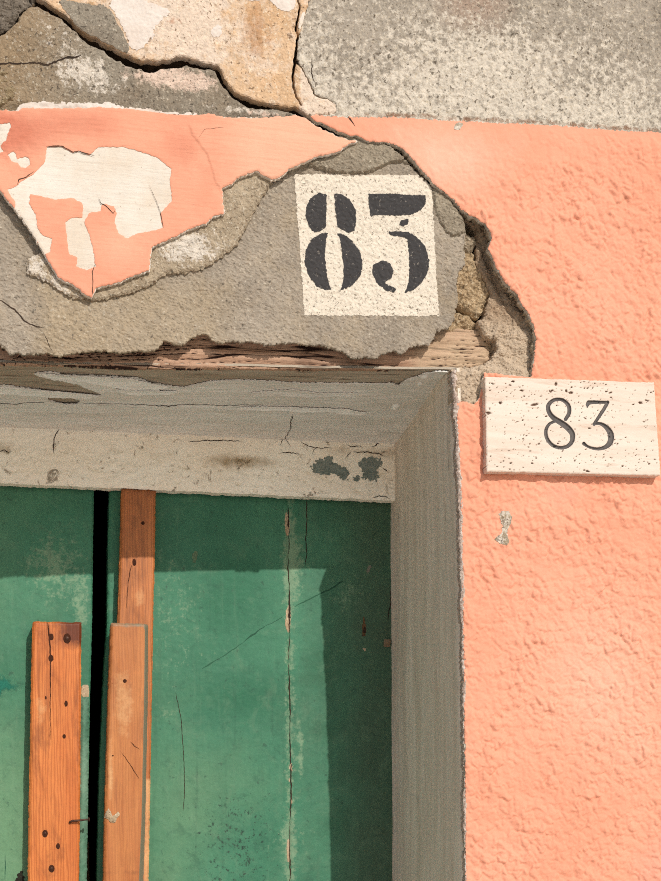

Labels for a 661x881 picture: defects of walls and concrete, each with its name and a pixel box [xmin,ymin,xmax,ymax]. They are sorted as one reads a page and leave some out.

peeling [59,0,170,53]
crack [0,2,354,135]
peeling [249,0,305,29]
spalling [0,123,535,881]